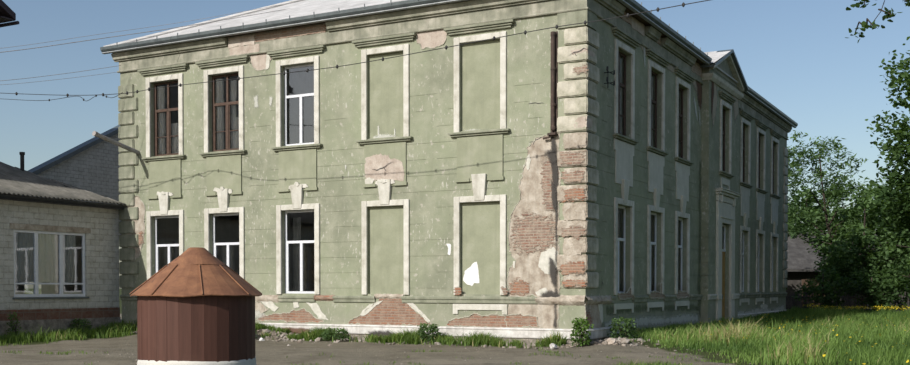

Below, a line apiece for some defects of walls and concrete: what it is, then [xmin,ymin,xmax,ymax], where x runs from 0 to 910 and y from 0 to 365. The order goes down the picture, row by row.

flaking render [364,153,405,185]
spalling [446,116,593,329]
spalling [255,301,328,324]
spalling [348,293,432,326]